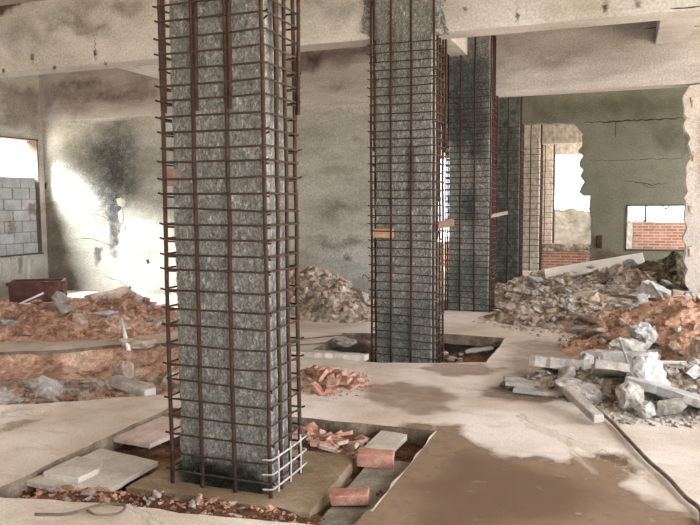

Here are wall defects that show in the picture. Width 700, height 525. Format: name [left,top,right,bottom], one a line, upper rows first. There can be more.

spalling [360,0,373,37]
spalling [435,0,450,36]
crack [583,117,684,137]
water stain [110,196,120,243]